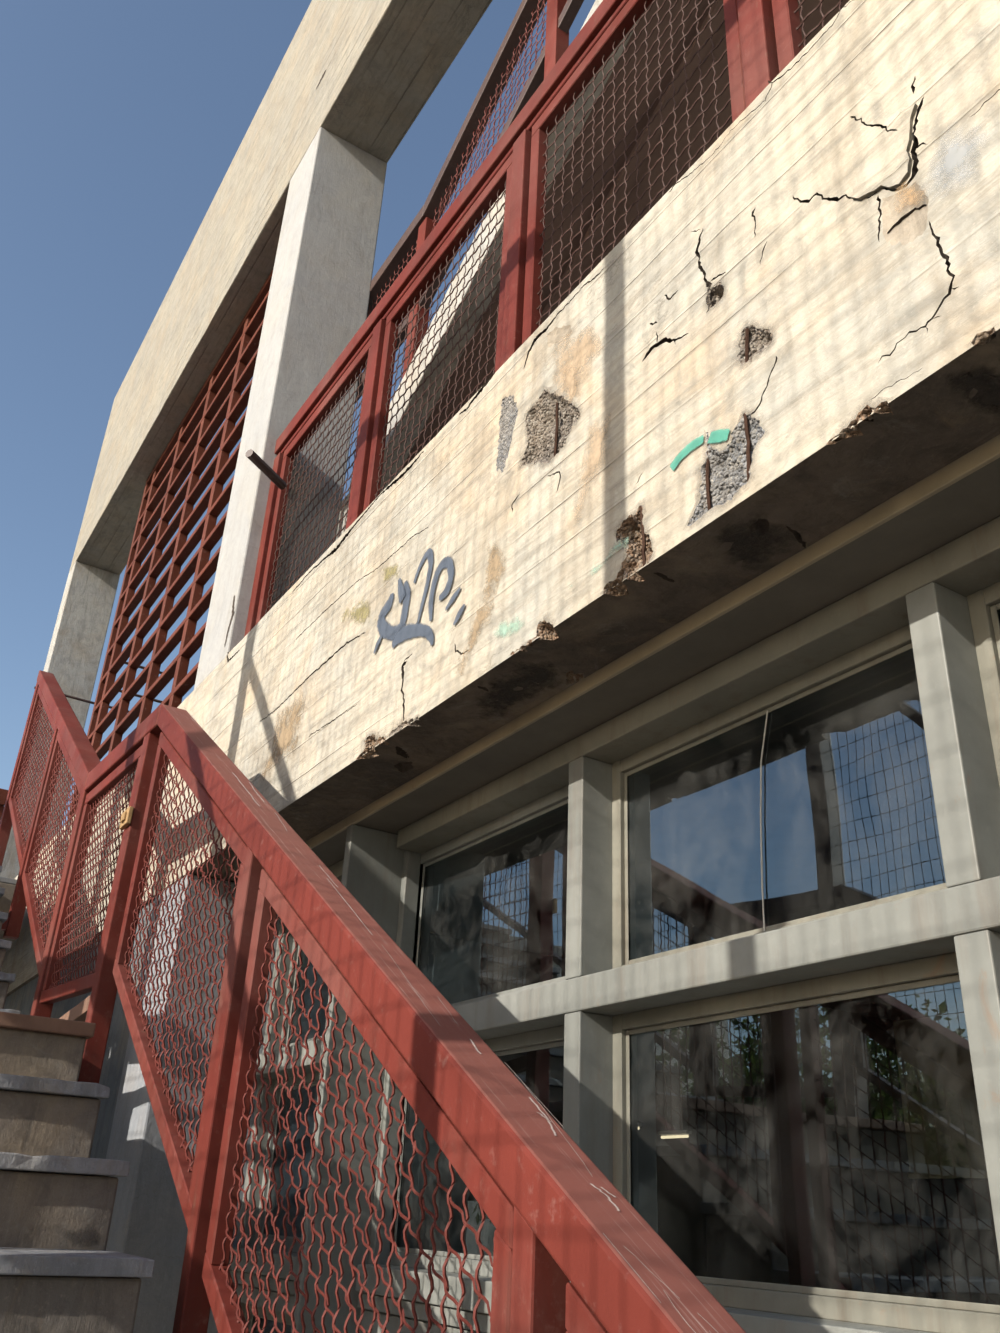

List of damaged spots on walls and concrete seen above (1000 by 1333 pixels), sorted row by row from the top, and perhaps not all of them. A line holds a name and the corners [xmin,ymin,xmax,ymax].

crack [793,78,958,399]
crack [643,229,726,360]
spalling [737,325,773,364]
spalling [496,389,581,473]
spalling [687,413,766,526]
spalling [827,401,893,445]
leakage [951,369,1000,413]
crack [293,451,424,591]
spalling [603,505,653,596]
crack [260,632,364,721]
spalling [356,716,421,760]
crack [395,654,412,758]